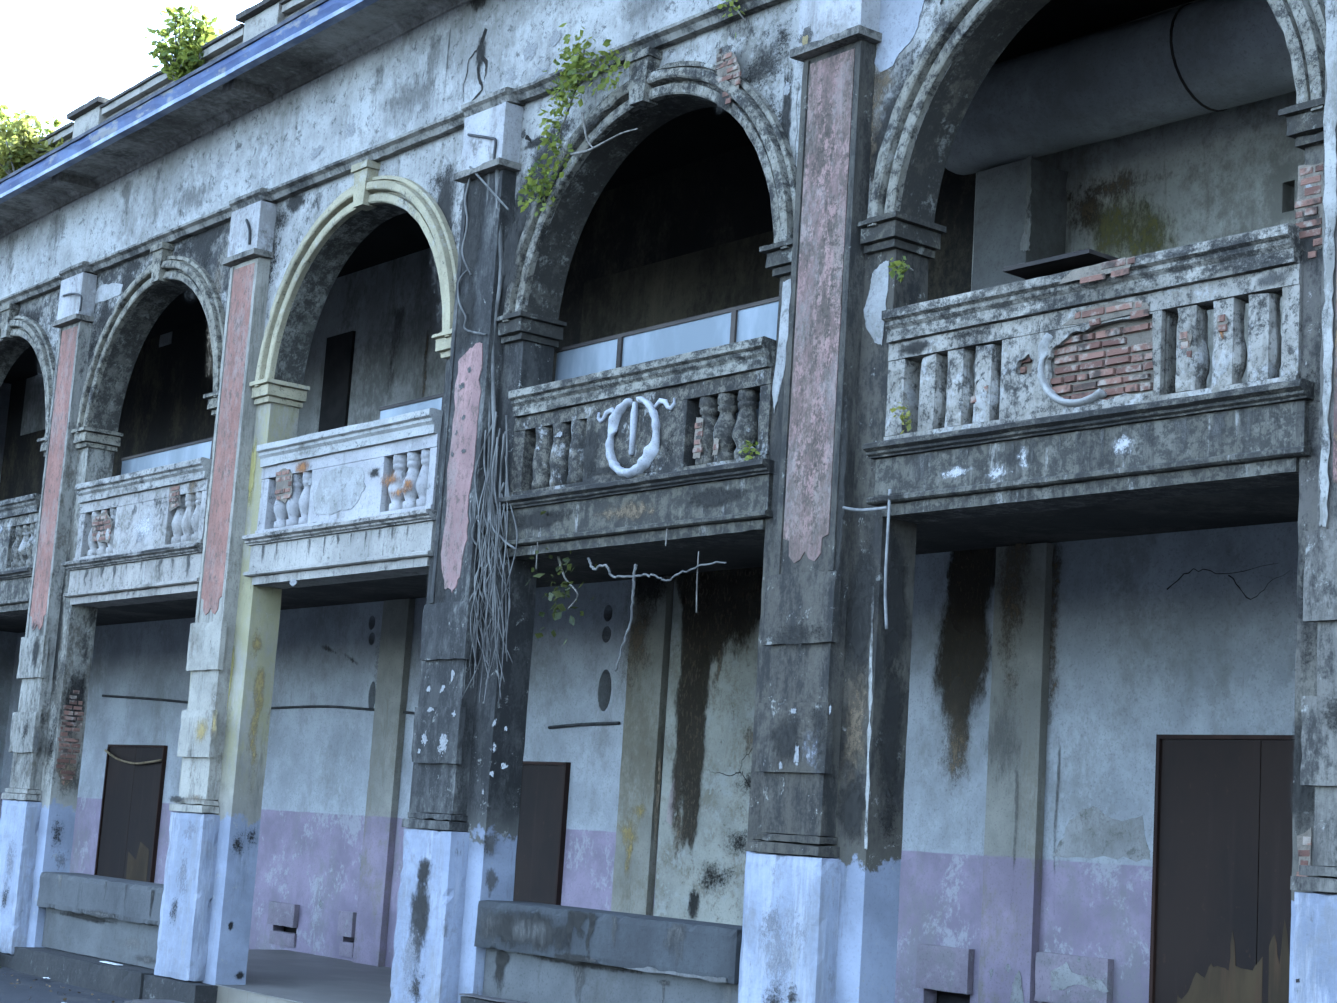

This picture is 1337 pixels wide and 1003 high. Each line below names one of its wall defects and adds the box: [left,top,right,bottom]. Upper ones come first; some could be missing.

peeling [863,261,889,345]
spalling [1059,256,1135,284]
spalling [1051,300,1192,400]
peeling [1295,0,1337,527]
damp [773,383,784,524]
spalling [56,672,86,787]
damp [620,567,763,856]
crack [709,729,753,796]
damp [772,702,830,761]
damp [835,399,909,844]
damp [934,543,1031,777]
crack [1167,563,1289,600]